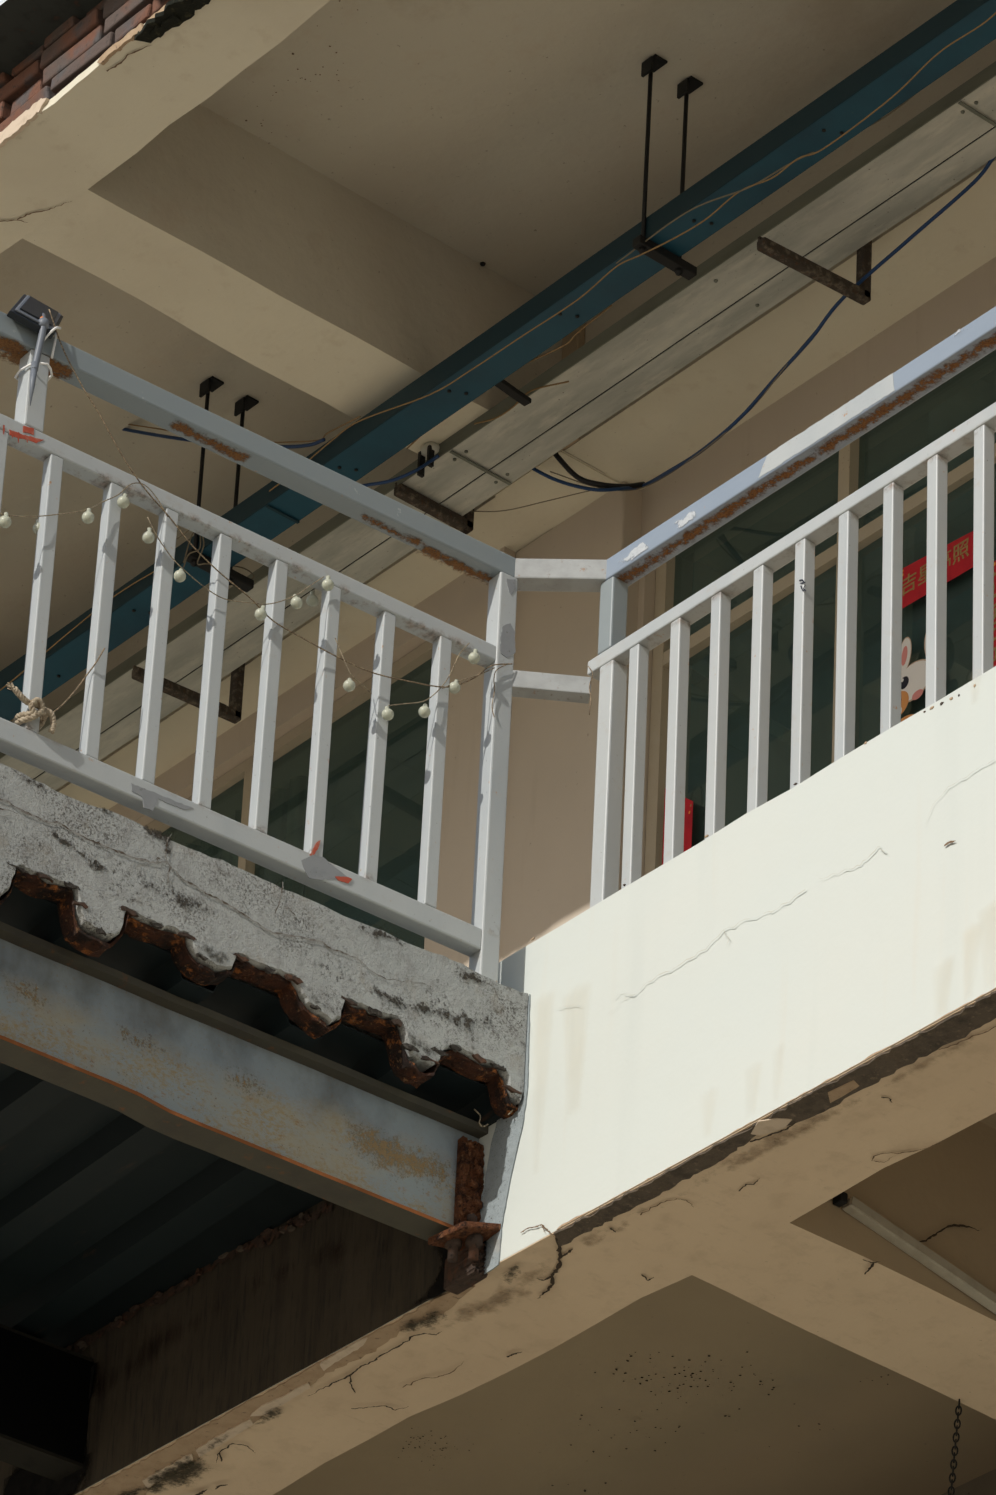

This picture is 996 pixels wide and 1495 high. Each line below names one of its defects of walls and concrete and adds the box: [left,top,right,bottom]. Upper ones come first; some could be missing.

crack [0,201,71,223]
rust [618,333,996,583]
spalling [7,862,88,909]
crack [0,798,432,987]
spalling [121,905,208,961]
rust [0,869,518,1119]
spalling [233,953,304,985]
flaking render [79,994,531,1495]
crack [521,1224,573,1298]
crack [919,1224,979,1242]
crack [309,1331,462,1411]
mould [122,1440,220,1495]